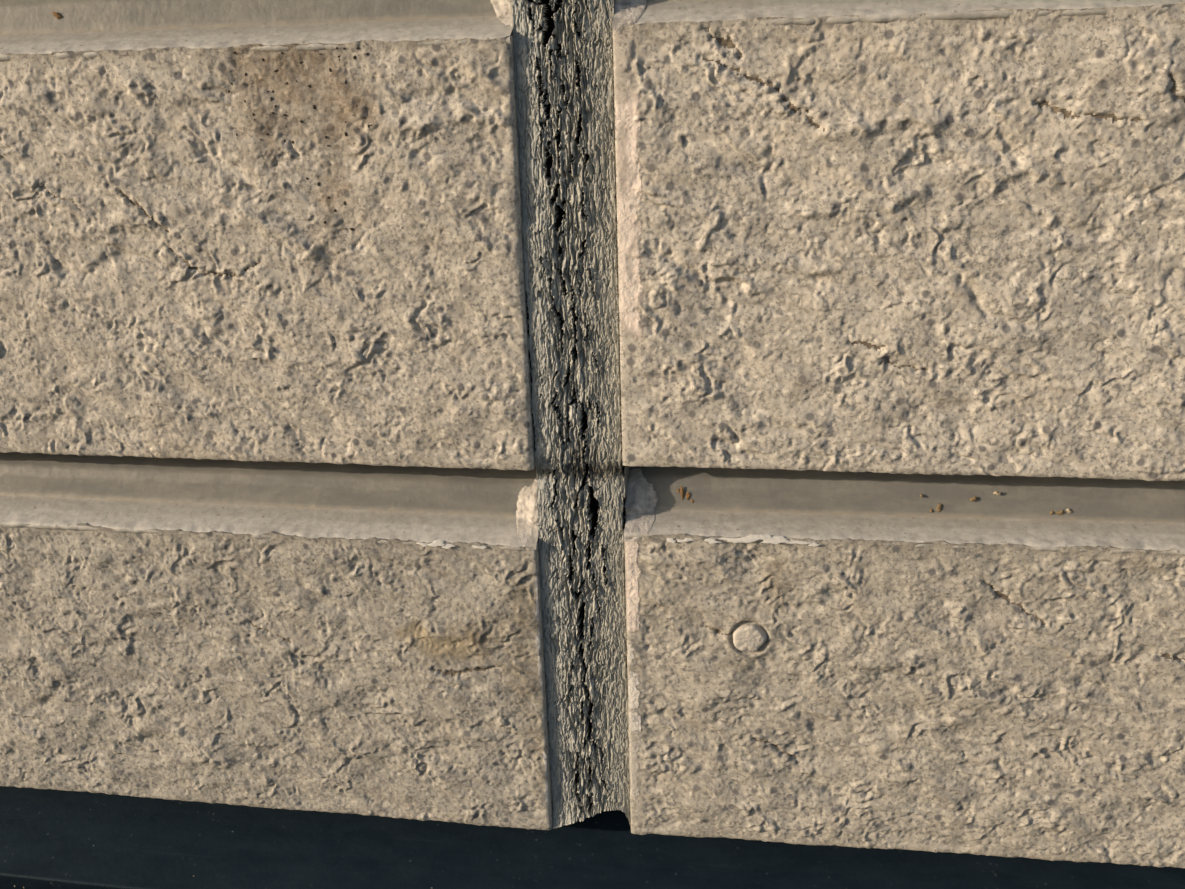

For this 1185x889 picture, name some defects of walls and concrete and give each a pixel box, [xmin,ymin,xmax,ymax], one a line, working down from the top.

crack [525,0,628,814]